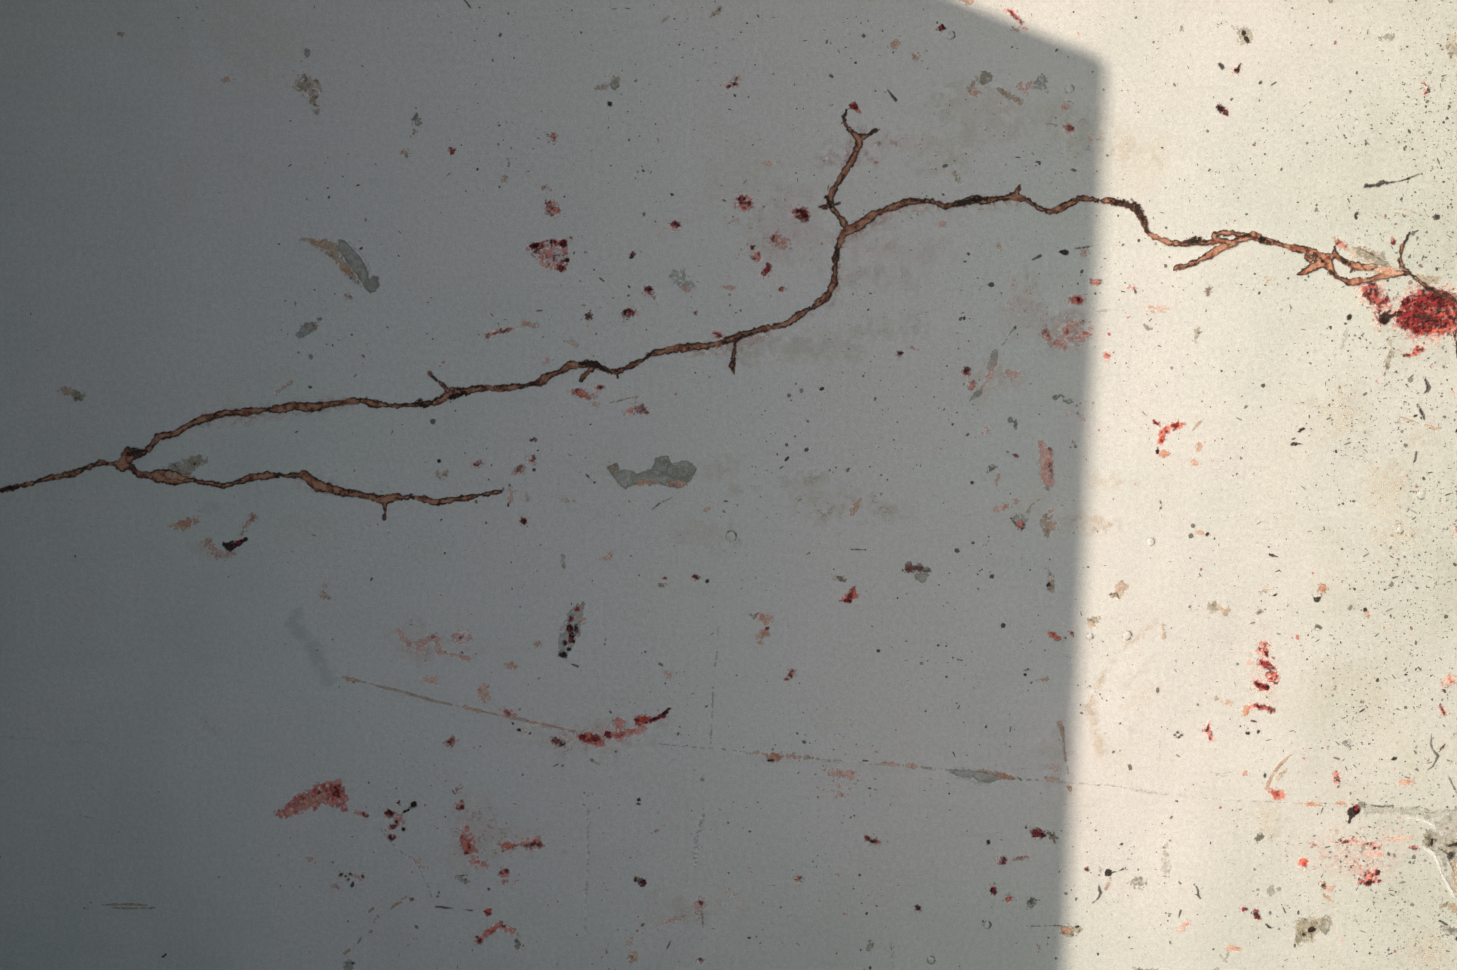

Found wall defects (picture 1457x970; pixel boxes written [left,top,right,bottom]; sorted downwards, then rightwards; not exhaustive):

peeling [299,236,380,299]
crack [0,109,1457,521]
rust [1351,277,1457,367]
peeling [608,456,697,509]